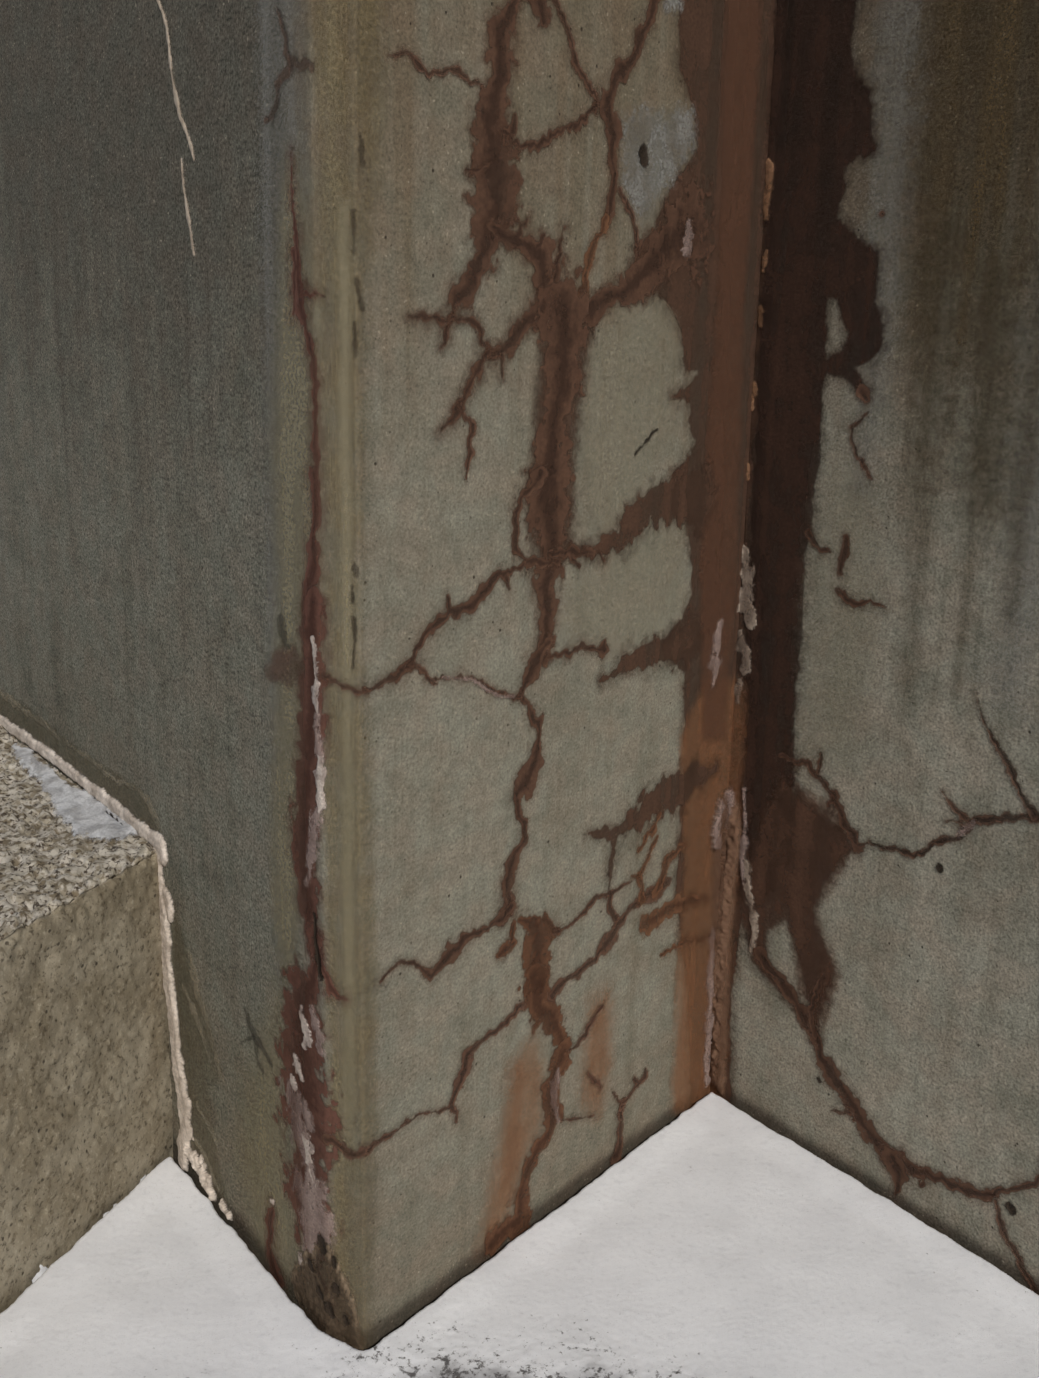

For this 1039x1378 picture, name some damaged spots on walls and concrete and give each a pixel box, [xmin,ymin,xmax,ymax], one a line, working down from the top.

crack [156,0,195,256]
water stain [682,220,693,256]
water stain [763,158,774,221]
crack [244,0,716,1257]
corrosion [568,0,885,1110]
water stain [711,544,757,704]
crack [778,692,1039,859]
water stain [704,788,759,1096]
crack [753,946,1039,1295]
spalling [290,1234,365,1351]